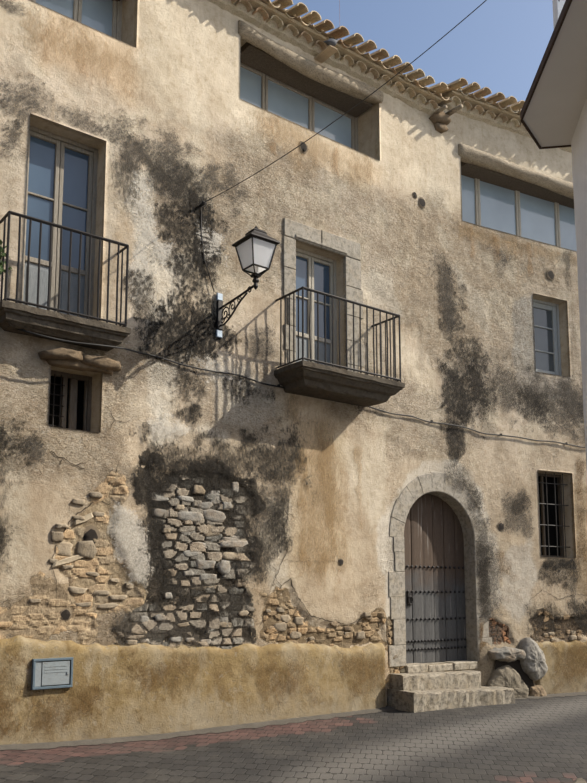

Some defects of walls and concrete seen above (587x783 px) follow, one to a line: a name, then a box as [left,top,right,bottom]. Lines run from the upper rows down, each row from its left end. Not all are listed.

damp [0,94,35,159]
damp [108,135,312,694]
damp [432,253,497,467]
damp [515,382,584,424]
damp [0,416,45,506]
damp [0,516,13,556]
spalling [0,448,406,674]
spalling [529,608,587,643]